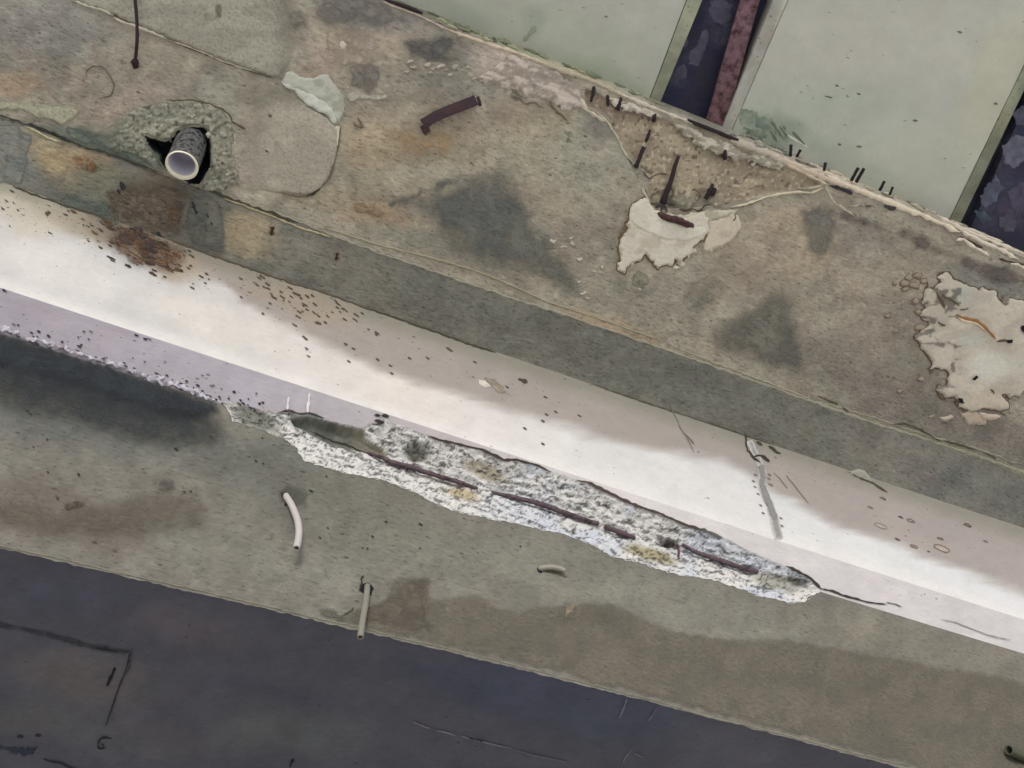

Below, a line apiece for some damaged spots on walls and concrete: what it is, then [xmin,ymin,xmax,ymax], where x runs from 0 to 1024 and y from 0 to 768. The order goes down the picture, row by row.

spalling [382,0,1024,275]
crack [13,186,110,219]
leakage [0,325,217,443]
rust [91,181,213,278]
crack [169,239,494,352]
leakage [418,180,590,300]
peeling [892,271,1024,425]
spalling [155,361,822,604]
crack [592,384,809,540]
crack [823,589,902,607]